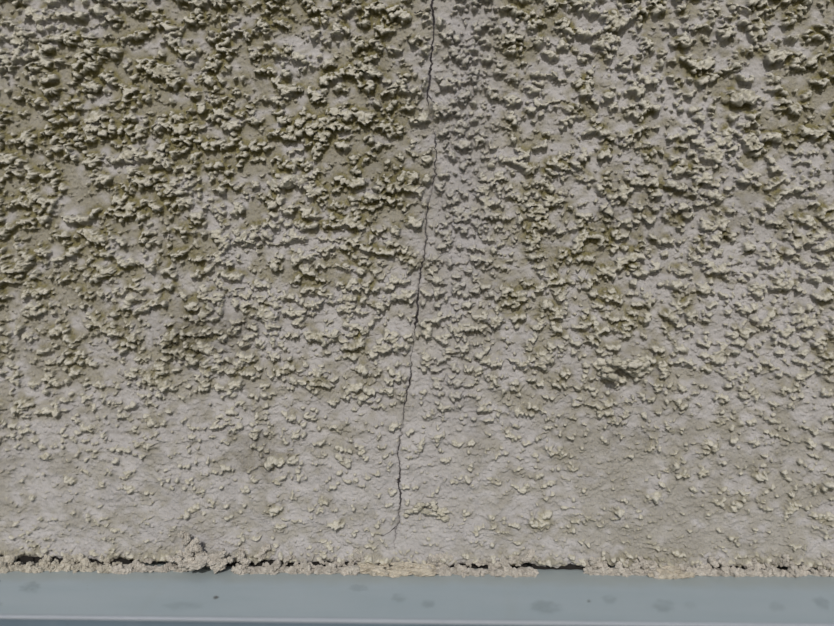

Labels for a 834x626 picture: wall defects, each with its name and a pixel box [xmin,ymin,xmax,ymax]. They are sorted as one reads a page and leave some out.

crack [381,0,437,549]